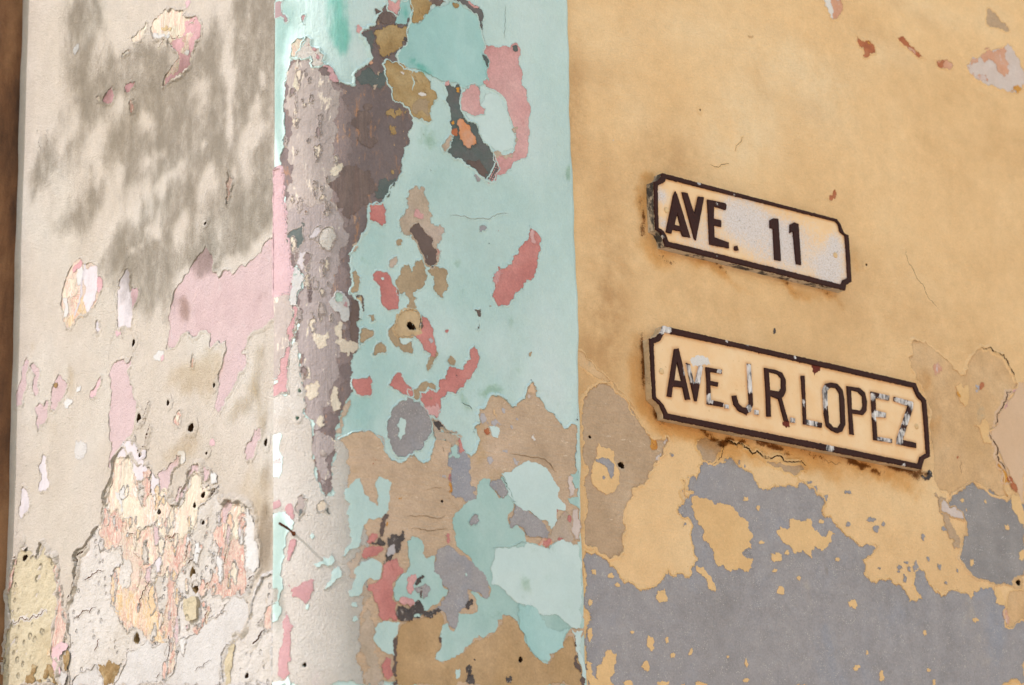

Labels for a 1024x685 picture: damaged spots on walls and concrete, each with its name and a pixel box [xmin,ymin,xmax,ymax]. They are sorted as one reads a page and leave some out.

spalling [965,7,1024,95]
spalling [0,0,582,685]
spalling [434,337,1024,685]
crack [712,437,809,470]